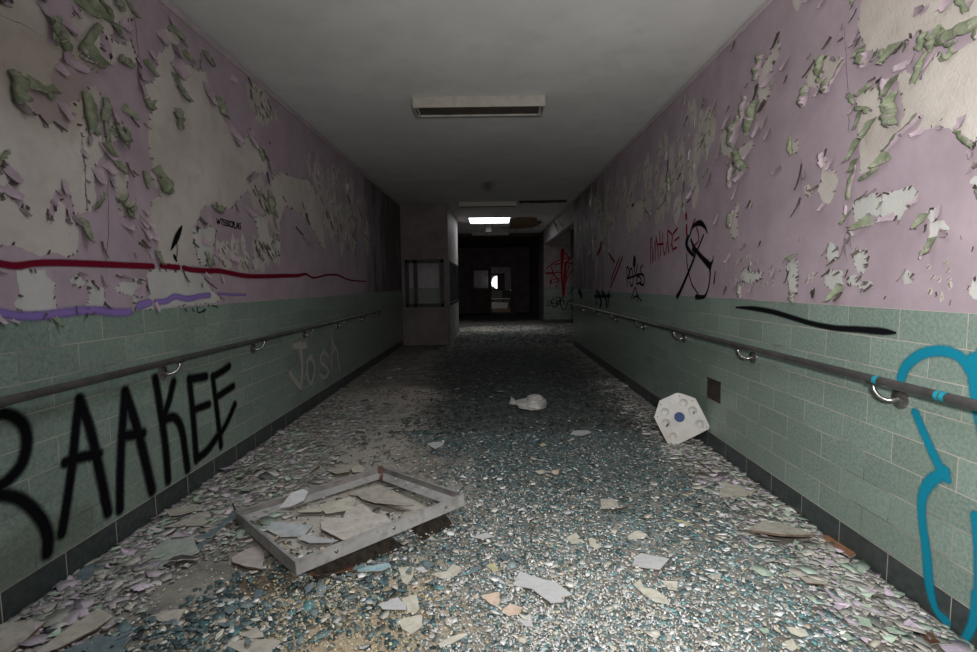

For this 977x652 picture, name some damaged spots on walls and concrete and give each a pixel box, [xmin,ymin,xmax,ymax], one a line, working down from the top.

peeling [0,269,64,328]
peeling [0,0,327,318]
spalling [501,200,573,238]
peeling [625,0,977,305]